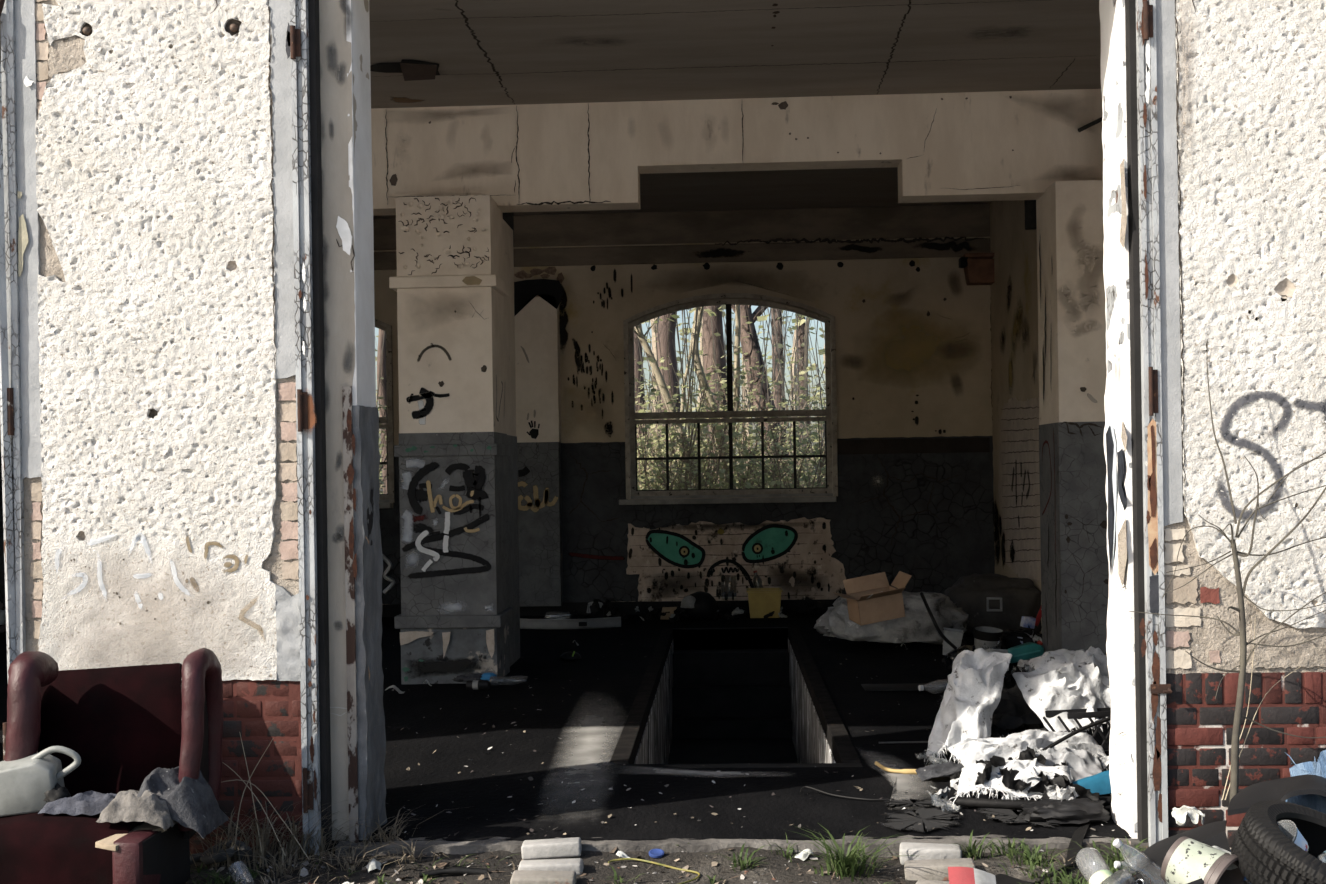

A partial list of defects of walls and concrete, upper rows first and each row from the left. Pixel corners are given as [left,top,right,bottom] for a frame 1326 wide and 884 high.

flaking render [24,0,86,118]
crack [371,0,1075,205]
flaking render [18,214,66,283]
flaking render [336,216,352,255]
flaking render [24,477,43,651]
flaking render [262,375,299,596]
flaking render [1164,518,1326,676]